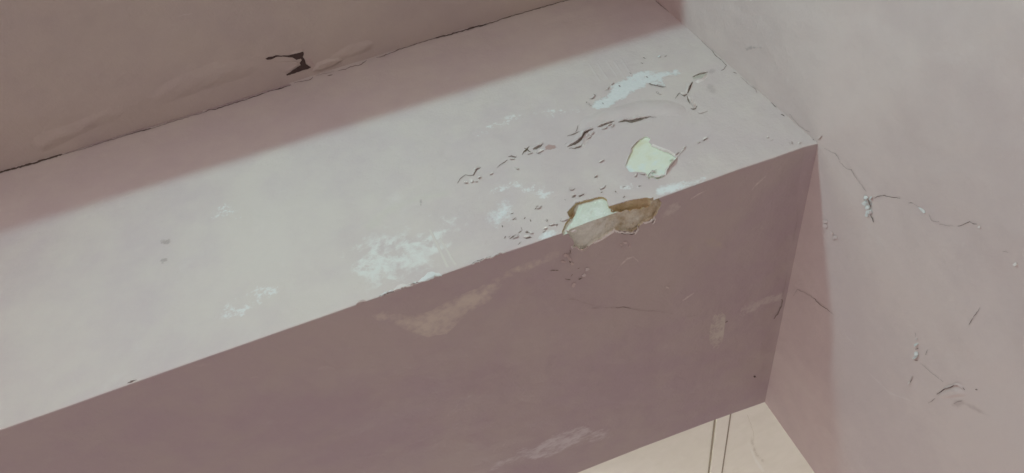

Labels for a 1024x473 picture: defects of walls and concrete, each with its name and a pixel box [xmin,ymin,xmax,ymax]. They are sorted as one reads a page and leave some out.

crack [0,0,567,173]
peeling [624,135,685,179]
crack [676,40,980,228]
spalling [502,175,661,287]
crack [923,365,977,404]